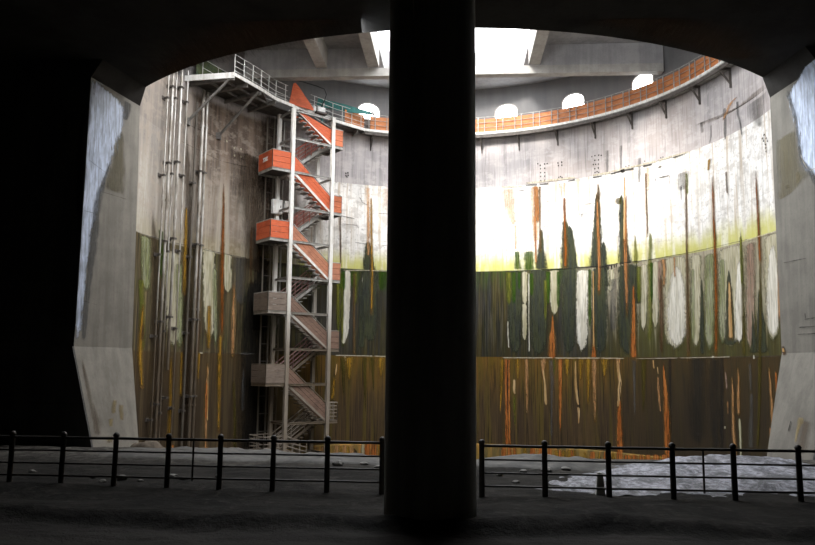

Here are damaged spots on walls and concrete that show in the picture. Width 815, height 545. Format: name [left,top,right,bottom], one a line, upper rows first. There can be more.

corrosion [218,189,235,428]
corrosion [331,275,355,399]
water stain [337,242,387,346]
corrosion [500,177,670,460]
water stain [507,194,780,356]
corrosion [198,353,208,448]
corrosion [334,444,380,455]